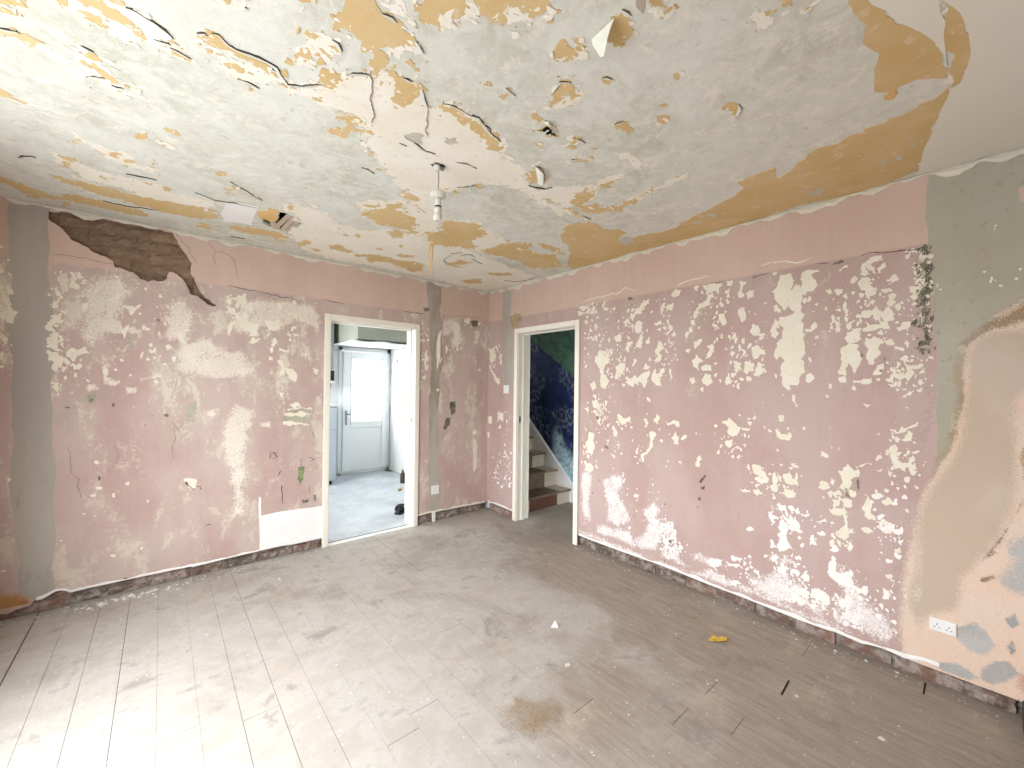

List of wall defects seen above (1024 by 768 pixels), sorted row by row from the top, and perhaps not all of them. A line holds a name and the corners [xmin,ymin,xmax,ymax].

peeling [0,0,53,50]
peeling [0,85,54,110]
peeling [55,0,971,291]
peeling [0,126,321,399]
peeling [419,318,502,385]
peeling [207,404,271,519]
peeling [472,411,512,489]
flaking render [577,255,1024,714]
flaking render [0,539,321,621]